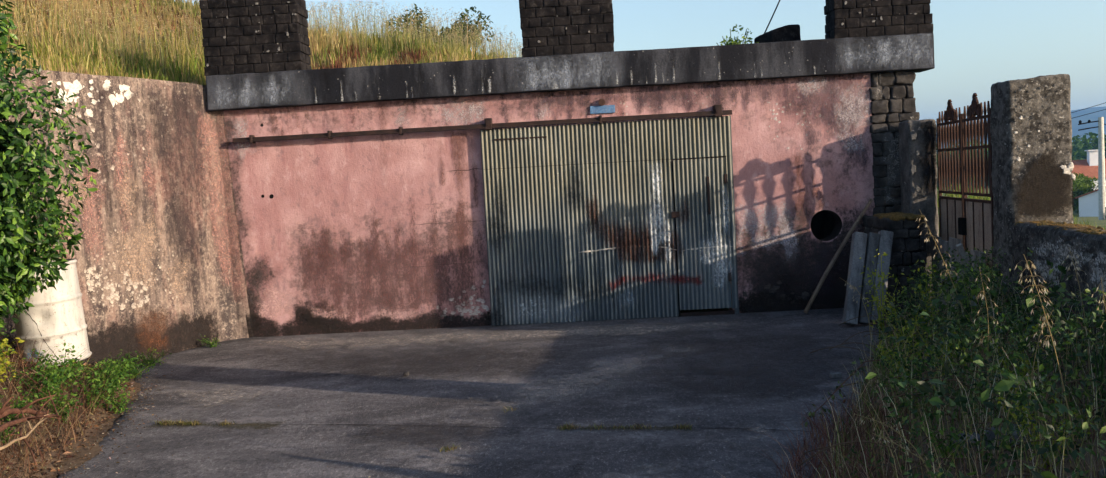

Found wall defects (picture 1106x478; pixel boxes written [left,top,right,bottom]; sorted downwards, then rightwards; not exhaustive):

leakage [97,90,107,144]
peeling [48,79,197,218]
flaking render [84,223,187,310]
leakage [149,85,204,279]
leakage [223,118,492,338]
leakage [519,66,589,120]
corrosion [587,198,682,262]
leakage [635,53,869,174]
leakage [736,156,873,313]
leakage [77,310,219,366]